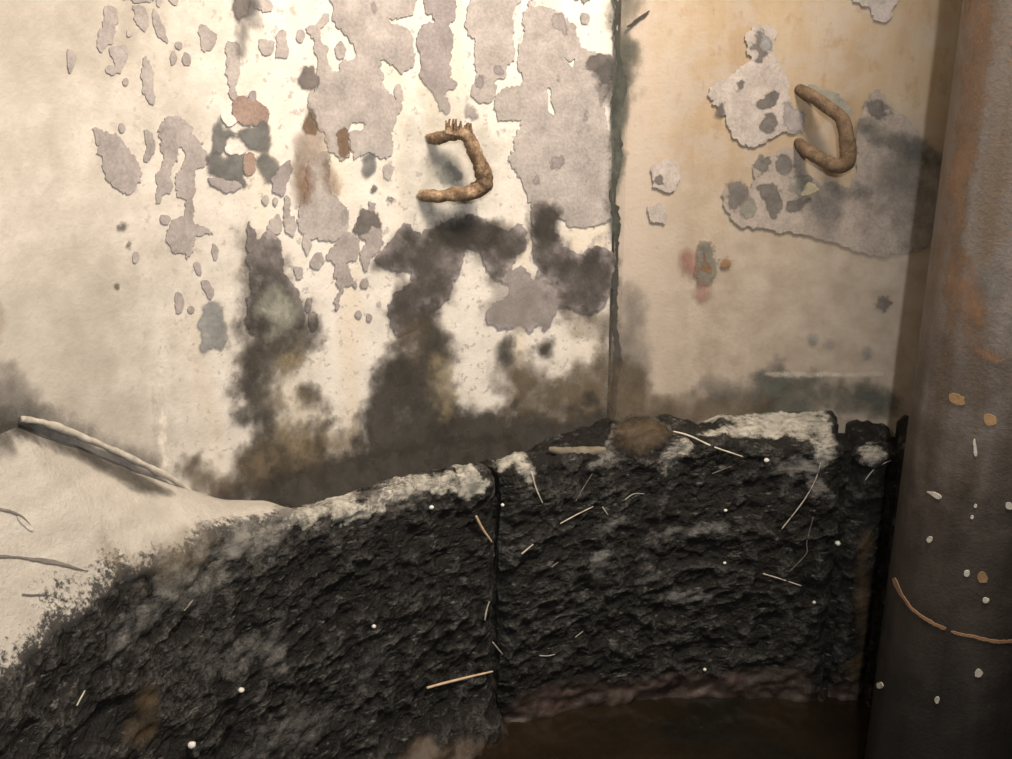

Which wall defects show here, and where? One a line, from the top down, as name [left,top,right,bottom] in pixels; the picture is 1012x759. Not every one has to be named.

peeling [66,49,77,73]
crack [611,0,650,116]
peeling [853,0,898,22]
peeling [92,0,613,310]
leakage [586,28,635,232]
peeling [707,23,939,258]
peeling [174,291,195,314]
peeling [305,297,318,323]
leakage [184,203,897,530]
crack [609,142,623,420]
leakage [0,380,168,493]